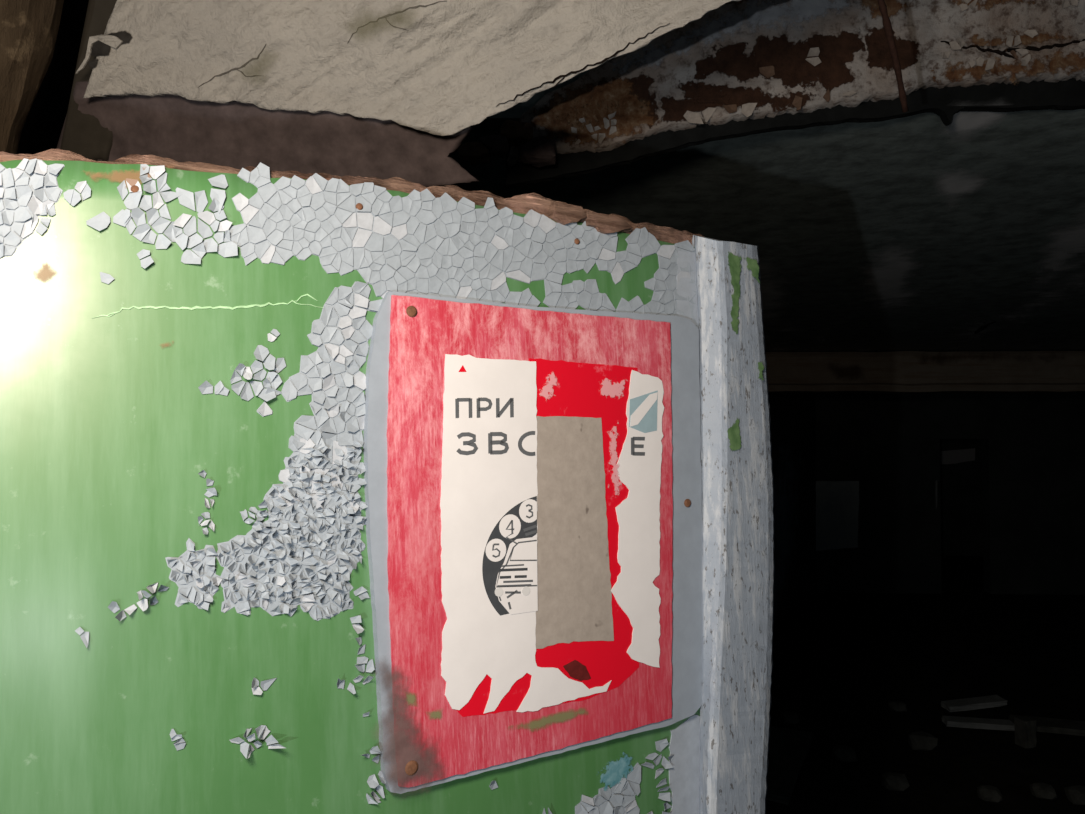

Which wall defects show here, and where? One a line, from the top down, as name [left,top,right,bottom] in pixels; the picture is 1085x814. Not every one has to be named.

crack [198,44,266,88]
crack [348,1,445,43]
spalling [598,0,921,129]
crack [940,39,1085,59]
corrosion [531,77,655,148]
peeling [0,158,91,259]
peeling [86,162,698,695]
peeling [75,627,89,648]
peeling [170,729,186,750]
peeling [230,725,286,759]
peeling [362,746,386,804]
peeling [575,739,675,814]